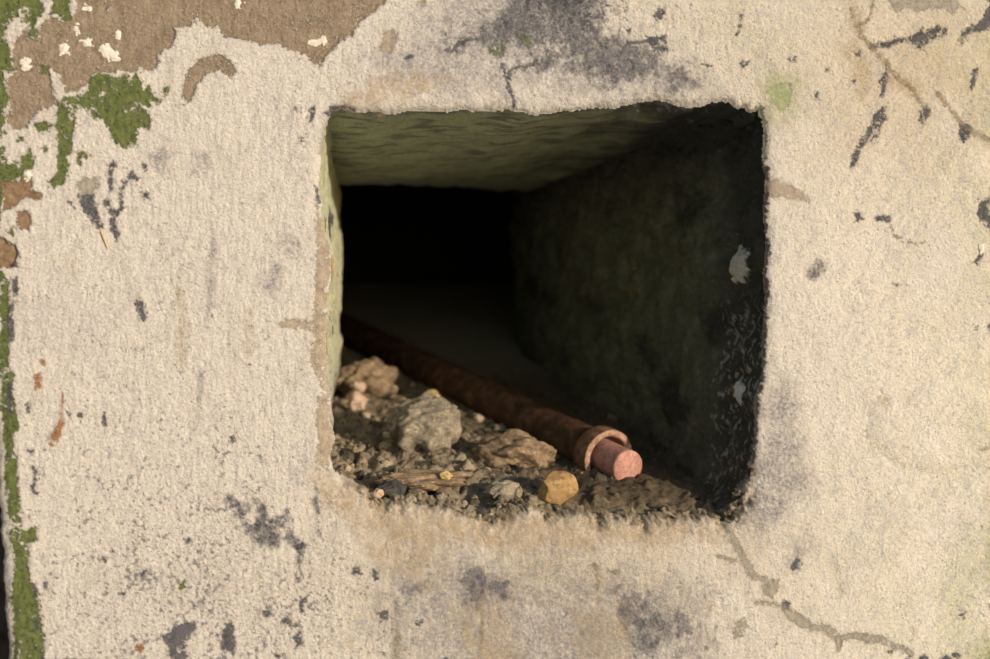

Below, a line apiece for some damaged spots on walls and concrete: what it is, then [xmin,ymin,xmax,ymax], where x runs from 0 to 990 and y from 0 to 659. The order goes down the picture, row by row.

spalling [380,30,399,53]
water stain [435,0,698,92]
spalling [0,0,385,659]
crack [716,521,914,656]